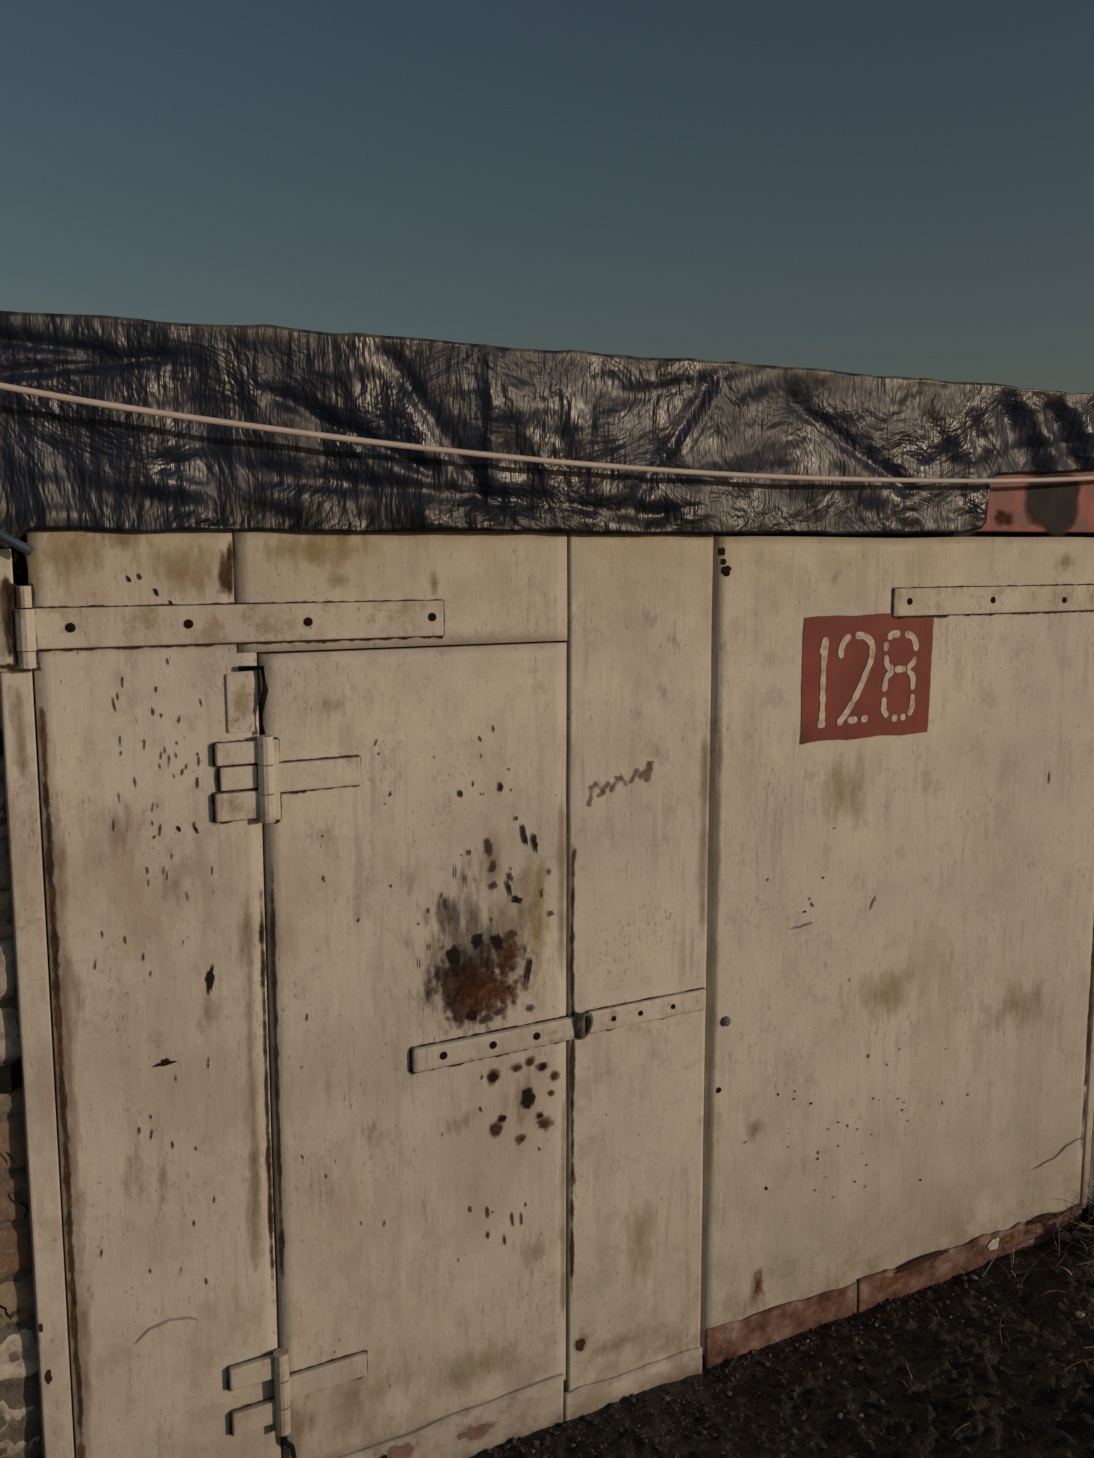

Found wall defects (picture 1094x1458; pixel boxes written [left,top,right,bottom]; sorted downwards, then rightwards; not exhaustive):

corrosion [996,511,1013,525]
corrosion [419,816,577,1029]
corrosion [20,708,90,1458]
corrosion [563,1039,576,1304]
corrosion [755,1271,763,1294]